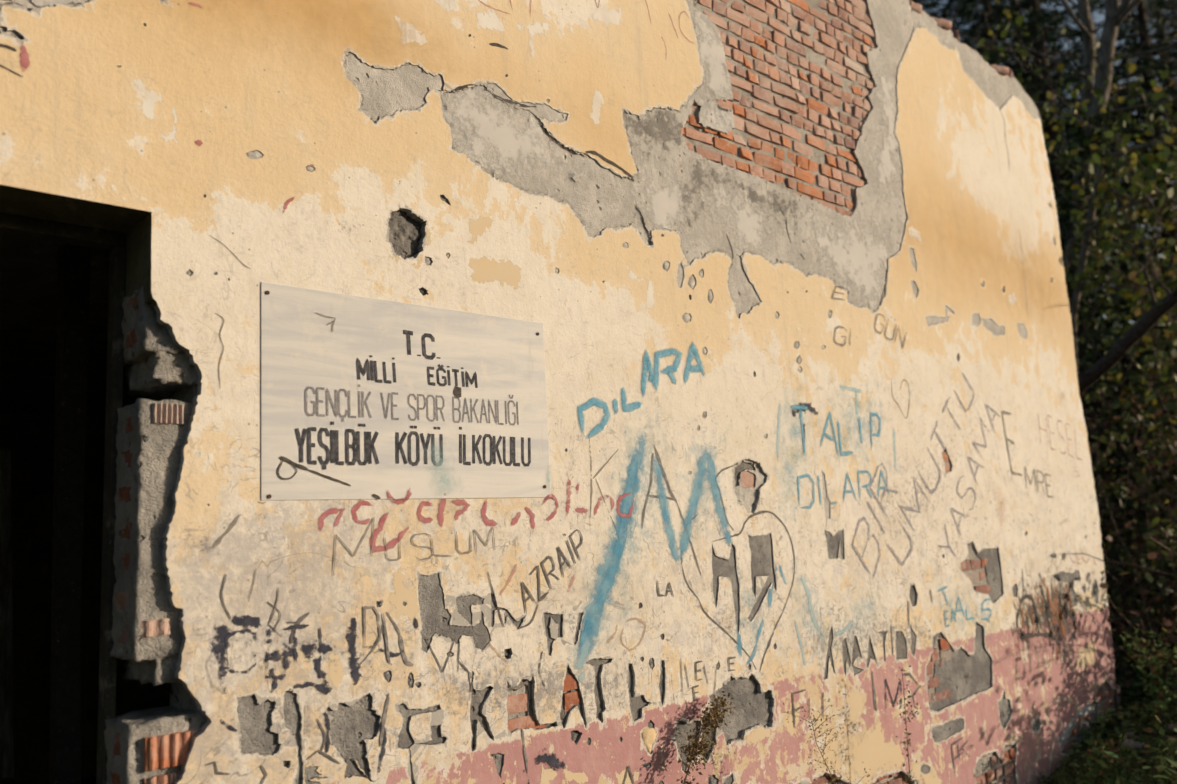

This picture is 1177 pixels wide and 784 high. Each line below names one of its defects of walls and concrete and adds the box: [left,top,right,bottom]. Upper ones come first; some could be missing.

crack [445,84,634,182]
peeling [343,0,1040,326]
spalling [960,541,1018,603]
spalling [237,689,330,784]
spalling [327,693,381,782]
peeling [416,724,447,745]
flaking render [507,679,546,732]
flaking render [562,675,581,713]
spalling [675,661,800,772]
peeling [789,691,942,784]
spalling [926,622,1012,742]
flaking render [974,743,1017,784]